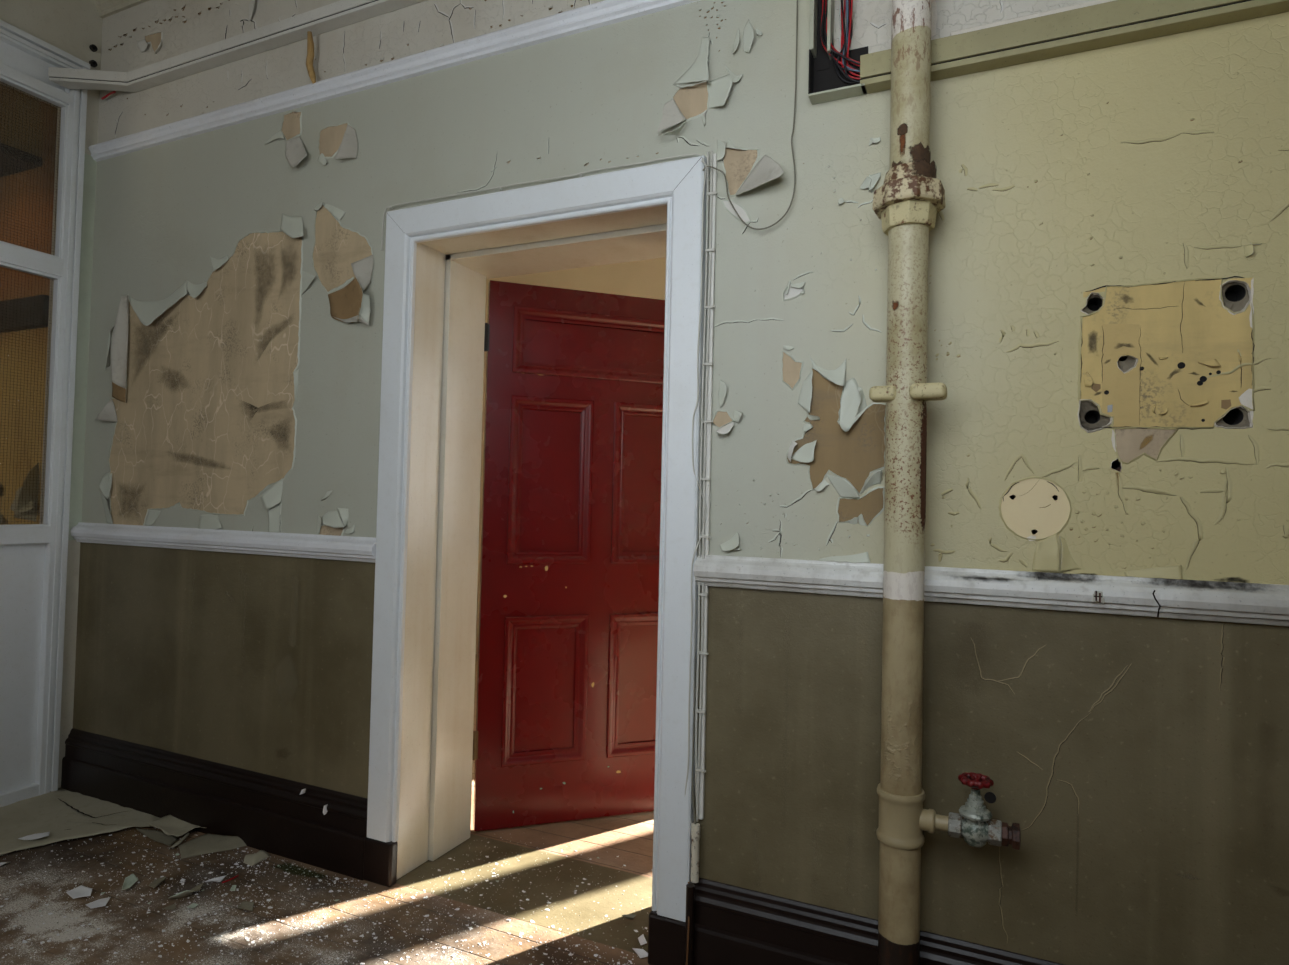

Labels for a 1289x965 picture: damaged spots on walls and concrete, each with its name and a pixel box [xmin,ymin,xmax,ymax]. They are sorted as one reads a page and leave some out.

crack [379,0,533,49]
corrosion [892,123,937,178]
crack [1121,130,1214,144]
peeling [716,139,804,224]
crack [959,164,1015,192]
spalling [1080,292,1104,315]
hole [1219,280,1252,315]
peeling [95,202,374,536]
peeling [781,345,886,527]
hole [1077,399,1113,433]
crack [941,243,1289,570]
spalling [1215,406,1253,429]